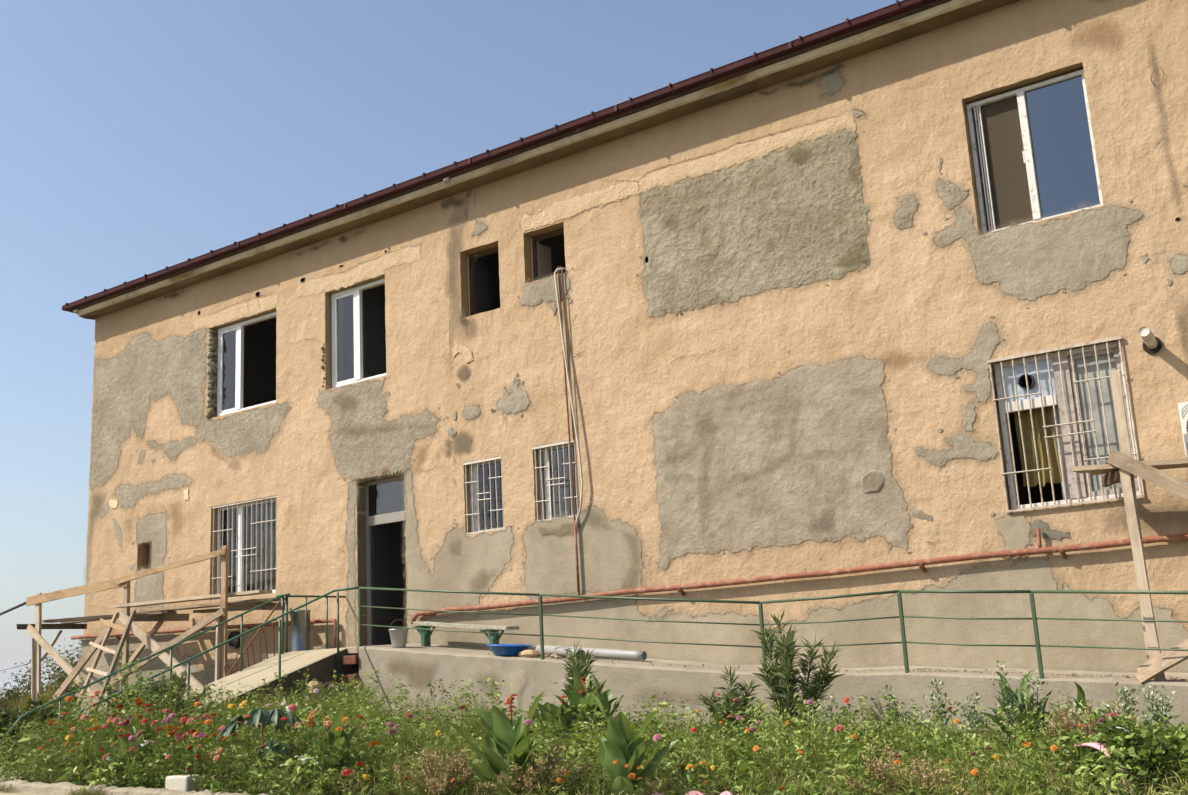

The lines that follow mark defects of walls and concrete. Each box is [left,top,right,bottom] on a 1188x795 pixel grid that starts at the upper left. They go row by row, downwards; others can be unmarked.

crack [565,109,863,219]
flaking render [893,157,1149,308]
flaking render [90,328,292,570]
flaking render [317,343,530,499]
flaking render [915,315,1004,467]